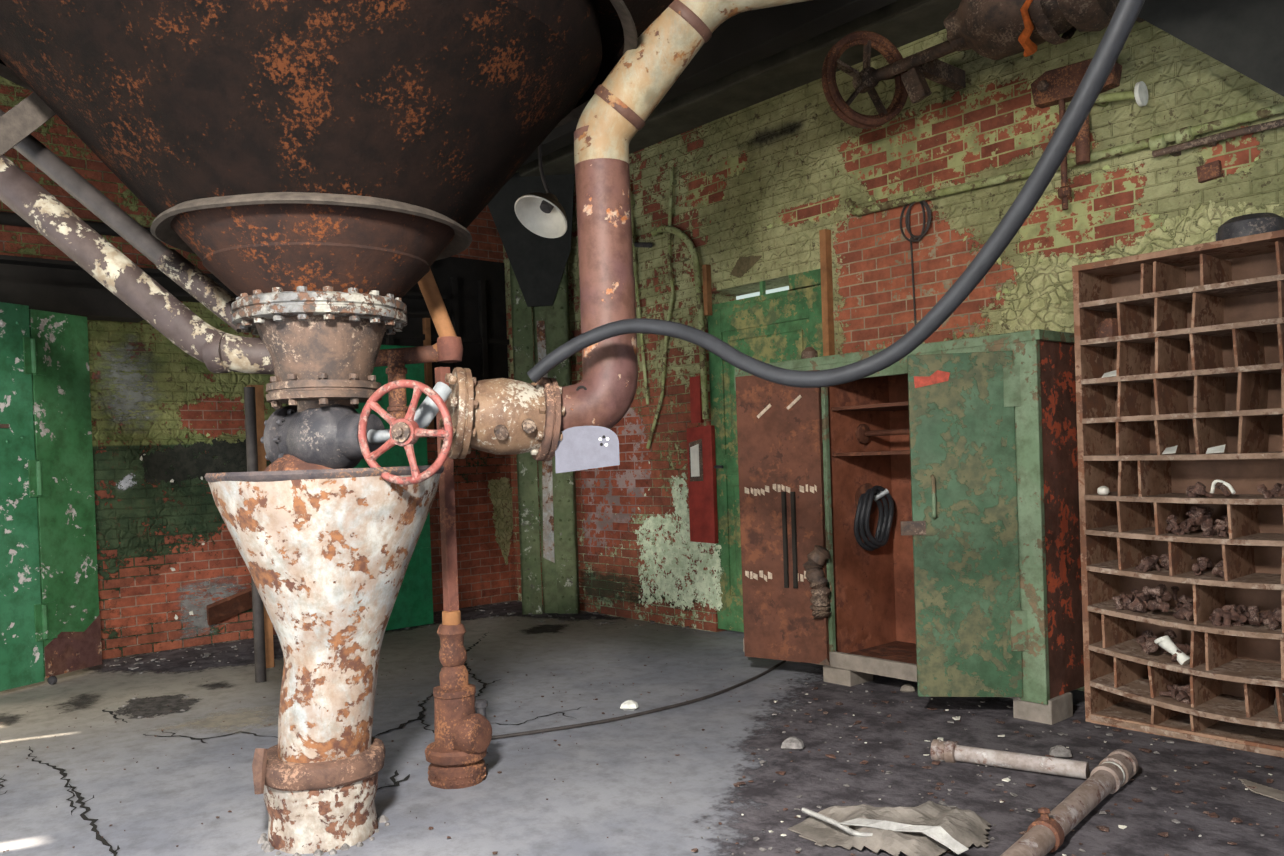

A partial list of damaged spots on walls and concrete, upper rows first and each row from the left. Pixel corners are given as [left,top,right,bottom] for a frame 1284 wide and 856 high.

peeling [685,122,802,210]
peeling [730,255,762,278]
peeling [766,73,1068,354]
peeling [924,163,1168,343]
peeling [116,392,247,490]
peeling [580,406,724,611]
peeling [104,524,252,632]
spalling [116,694,200,719]
crack [374,693,435,737]
crack [28,746,120,856]
crack [377,770,410,790]